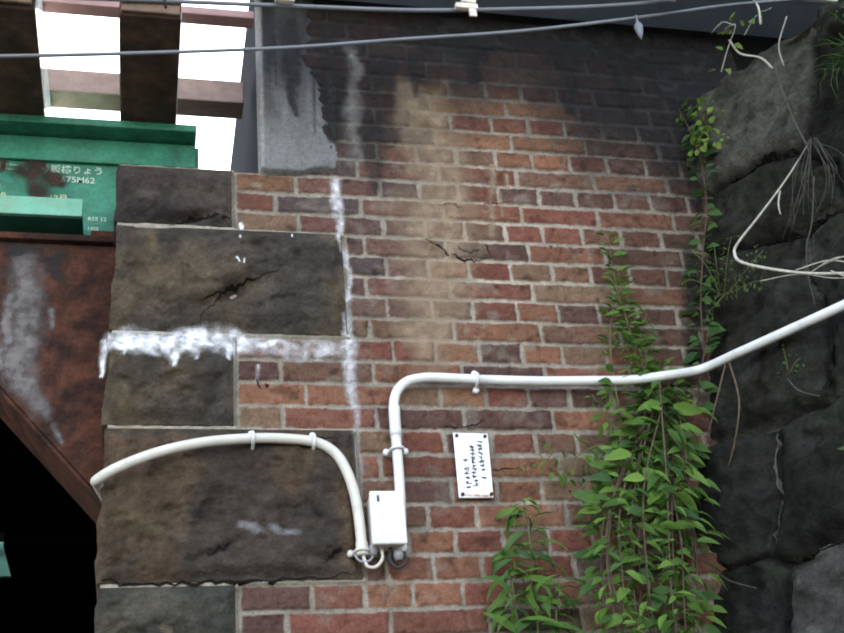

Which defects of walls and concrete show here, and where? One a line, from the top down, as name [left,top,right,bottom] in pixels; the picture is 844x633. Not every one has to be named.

corrosion [0,159,65,197]
crack [426,239,491,262]
crack [199,269,279,326]
damp [100,328,279,377]